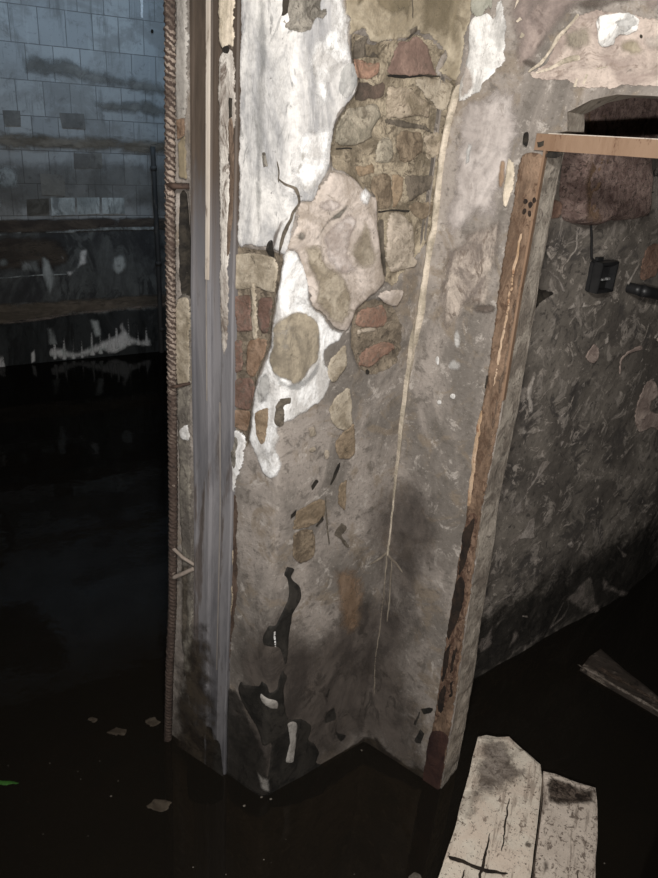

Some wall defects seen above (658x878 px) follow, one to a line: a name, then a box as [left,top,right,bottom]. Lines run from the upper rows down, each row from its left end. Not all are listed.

crack [273,162,301,255]
peeling [218,0,642,448]
flaking render [635,379,658,432]
leakage [378,485,432,594]
leakage [175,566,424,797]